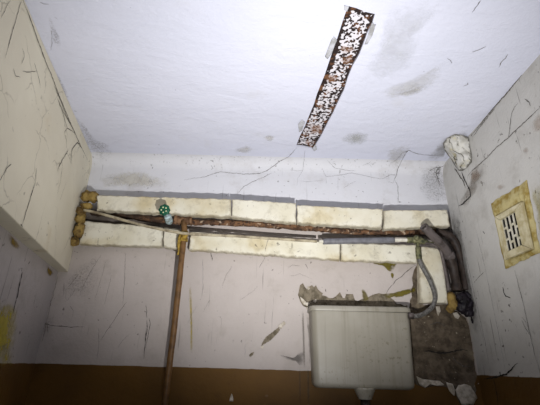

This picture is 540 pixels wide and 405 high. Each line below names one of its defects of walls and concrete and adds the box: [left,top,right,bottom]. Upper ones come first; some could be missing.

crack [3,1,87,194]
crack [239,151,351,192]
spalling [297,5,376,151]
crack [364,99,537,206]
crack [473,76,521,135]
flaking render [298,266,479,405]